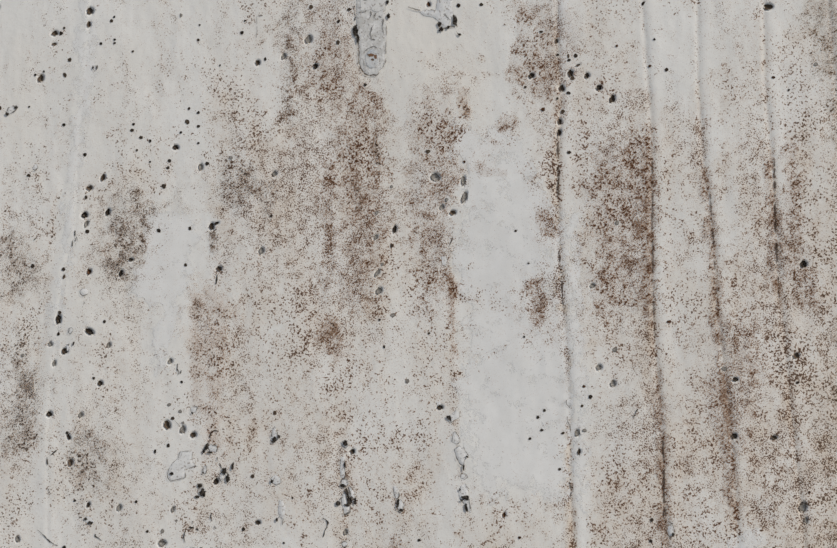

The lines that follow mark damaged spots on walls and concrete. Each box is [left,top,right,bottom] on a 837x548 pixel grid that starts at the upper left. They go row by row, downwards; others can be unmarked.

spalling [347,0,390,86]
spalling [409,0,461,36]
water stain [506,0,586,119]
water stain [214,148,287,222]
water stain [274,0,462,329]
water stain [763,144,819,310]
water stain [536,126,664,527]
water stain [700,155,769,529]
peeling [167,451,207,498]
peeling [214,462,234,484]
peeling [336,440,356,515]
peeling [437,405,471,512]